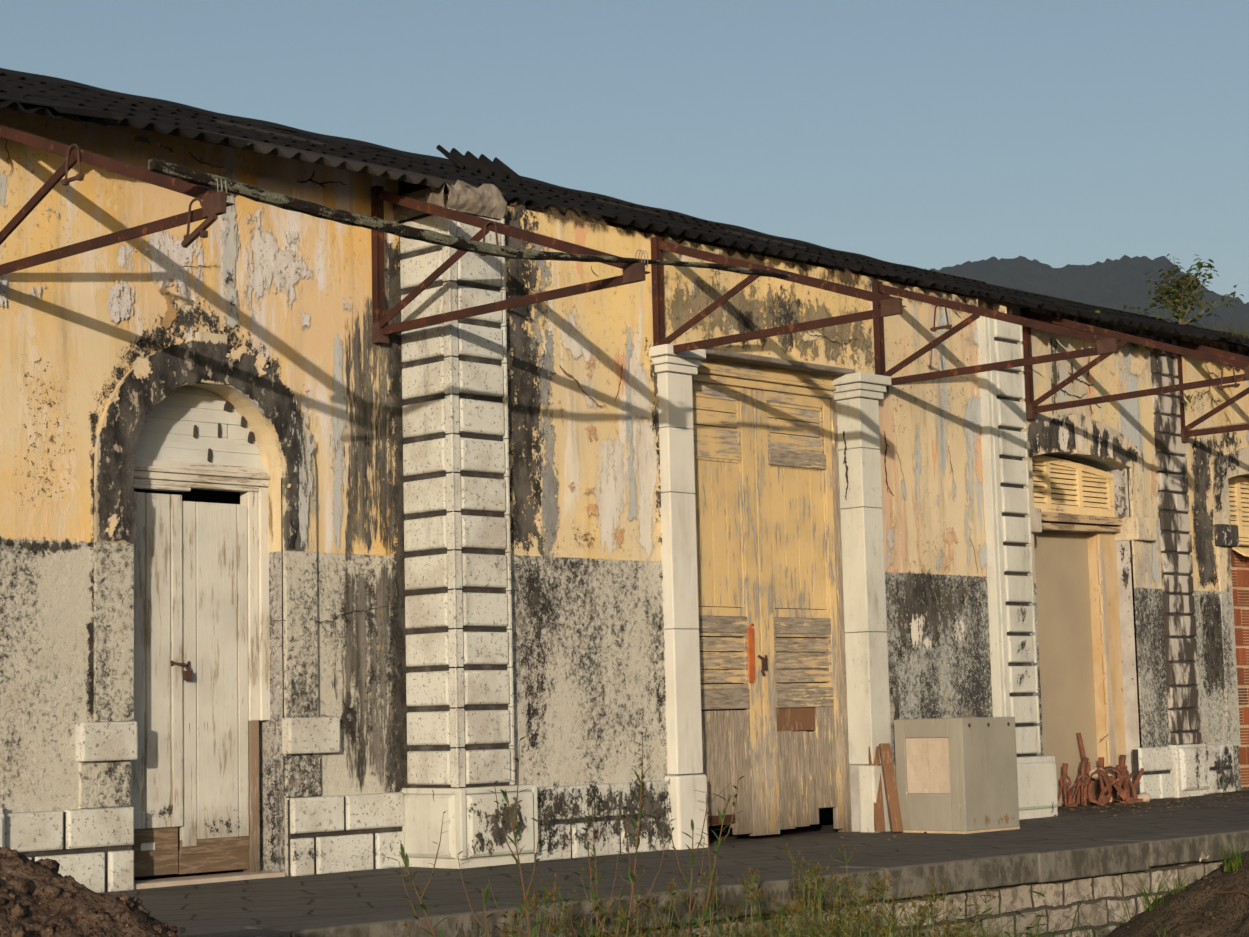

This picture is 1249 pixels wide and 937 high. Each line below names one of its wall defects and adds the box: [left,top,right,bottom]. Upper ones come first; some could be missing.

leakage [0,272,304,722]
peeling [106,230,206,329]
peeling [220,169,316,331]
leakage [332,239,410,793]
peeling [560,304,598,409]
peeling [568,326,659,562]
leakage [503,203,1002,757]
peeling [886,395,988,571]
leakage [1188,424,1241,701]
mould [258,754,397,872]